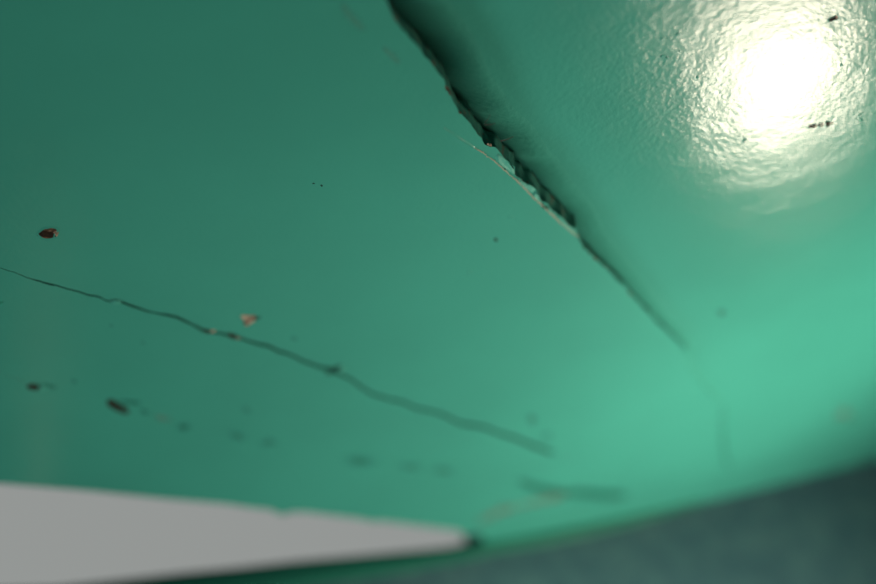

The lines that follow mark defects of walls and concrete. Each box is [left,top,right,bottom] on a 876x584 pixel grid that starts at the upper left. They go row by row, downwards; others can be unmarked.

peeling [36,226,60,240]
peeling [238,313,261,328]
crack [1,268,555,453]
crack [386,0,736,478]